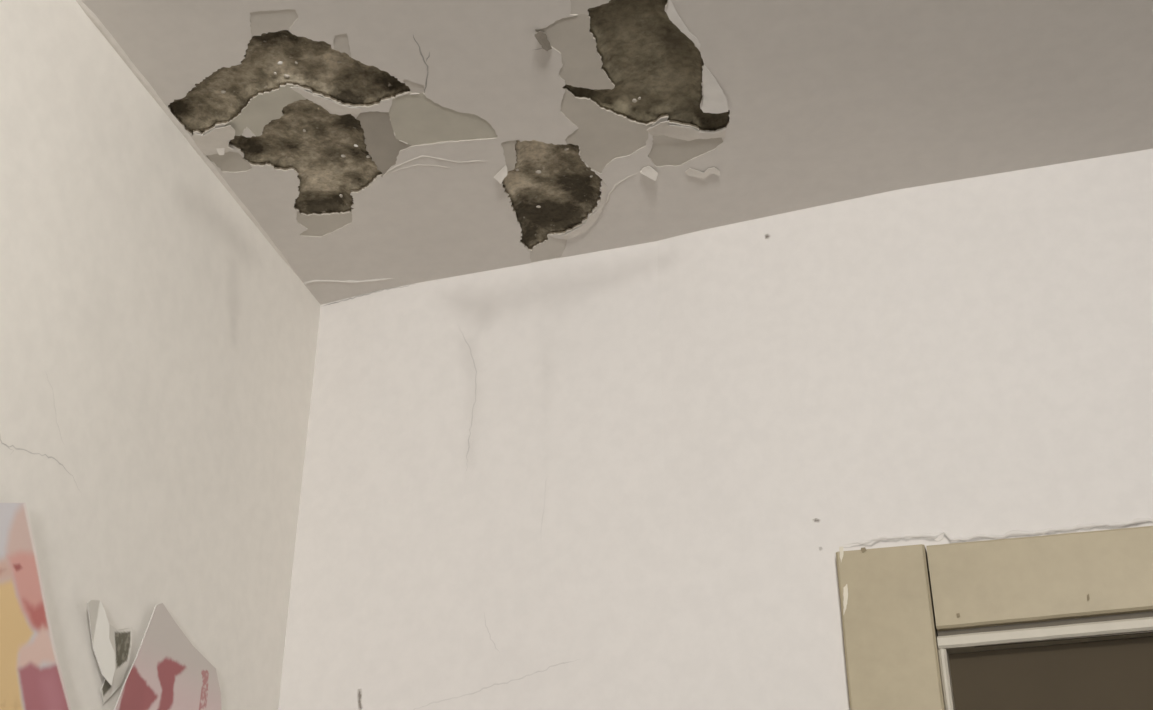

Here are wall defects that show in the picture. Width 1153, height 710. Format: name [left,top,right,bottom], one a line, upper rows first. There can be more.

spalling [168,0,730,263]